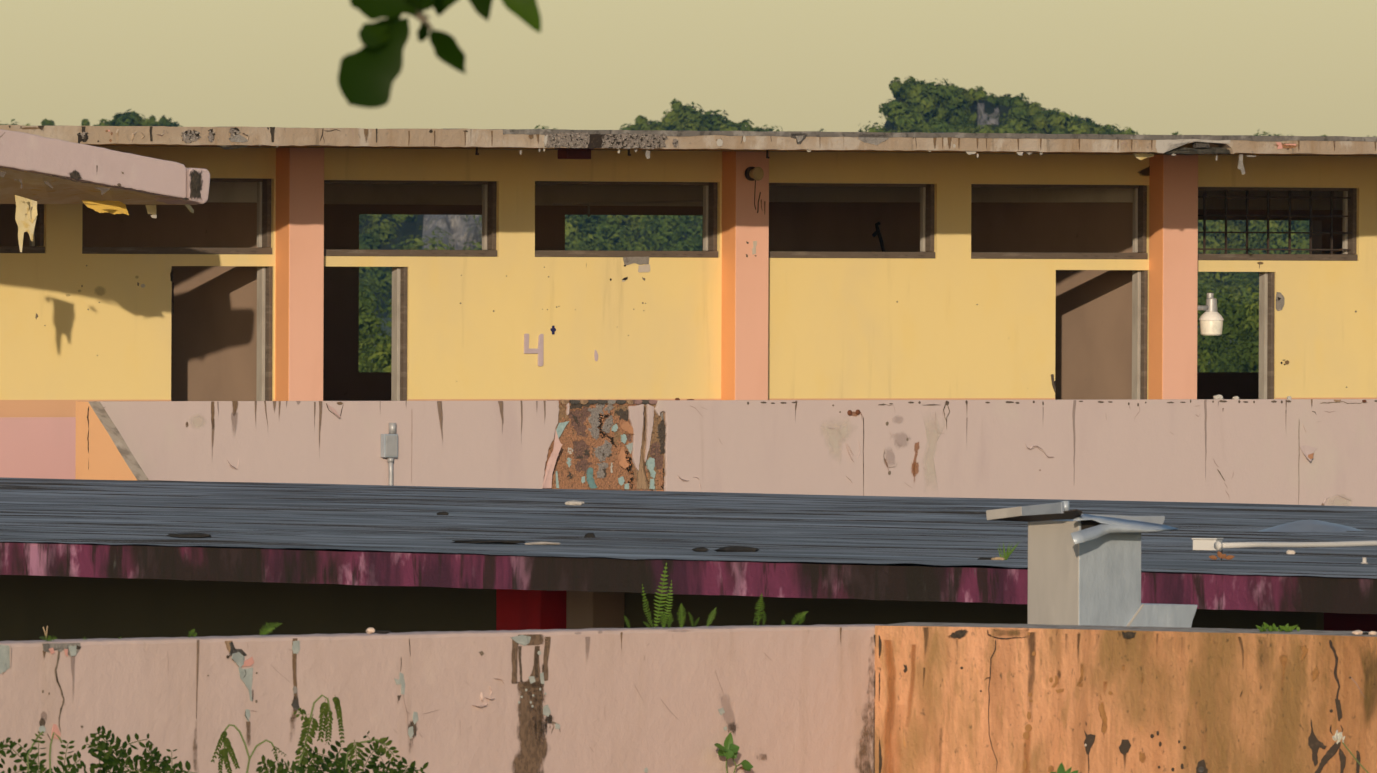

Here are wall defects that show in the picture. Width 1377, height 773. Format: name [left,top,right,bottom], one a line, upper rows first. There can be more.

spalling [520,132,678,159]
peeling [0,171,38,252]
leakage [314,401,322,442]
spalling [543,400,701,490]
peeling [225,641,258,743]
peeling [518,673,560,729]
leakage [1023,632,1036,739]